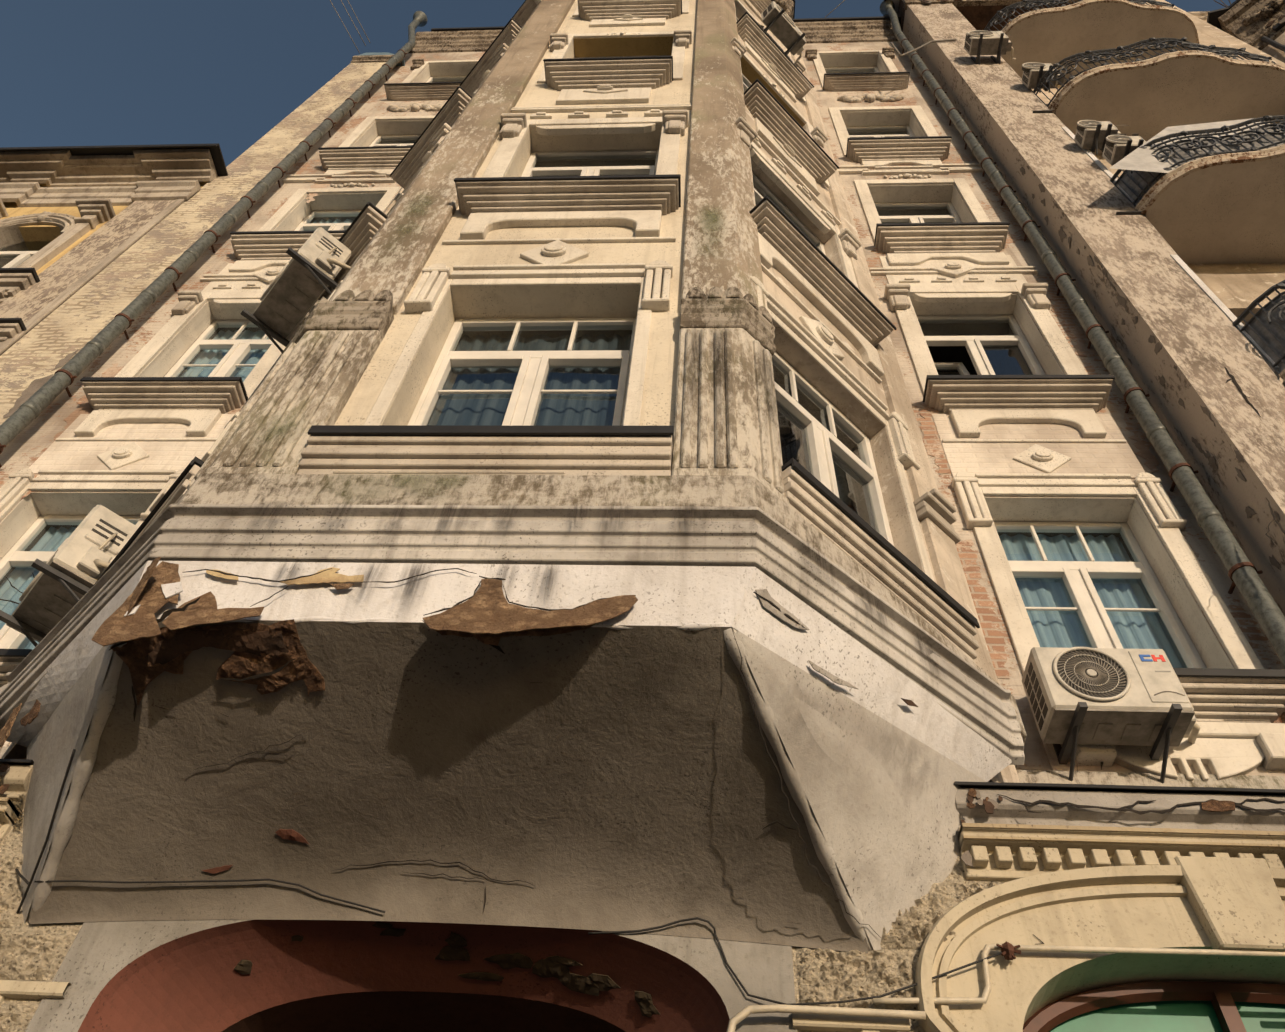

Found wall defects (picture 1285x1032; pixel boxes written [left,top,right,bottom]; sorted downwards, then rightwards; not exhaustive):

peeling [1032,184,1138,325]
flaking render [1047,287,1096,357]
peeling [3,349,79,418]
flaking render [101,363,123,377]
flaking render [54,395,93,440]
flaking render [1121,407,1159,474]
water stain [442,504,456,519]
water stain [407,565,423,590]
spalling [91,557,638,722]
spalling [0,699,41,795]
crack [997,794,1285,815]
crack [337,859,535,912]